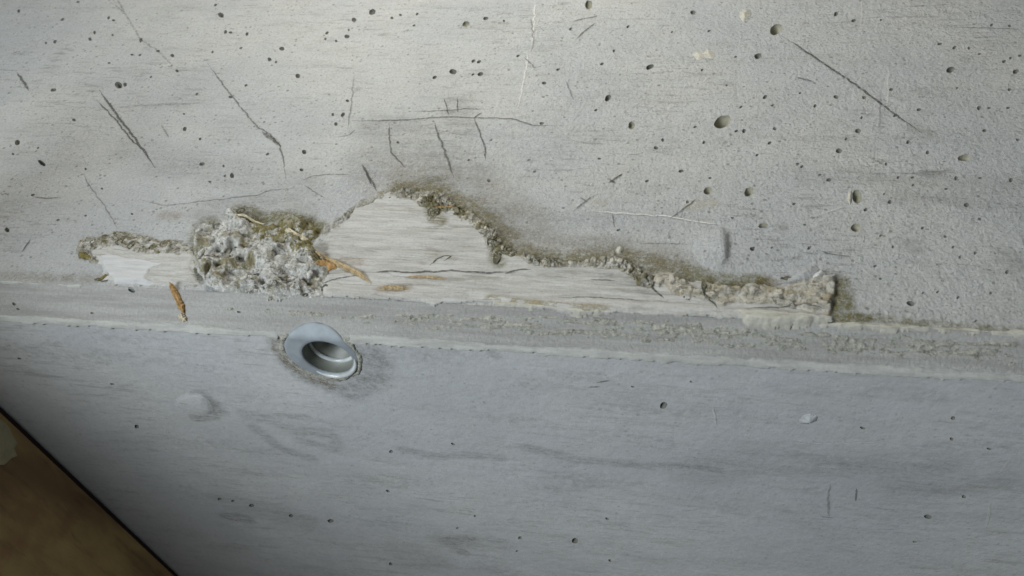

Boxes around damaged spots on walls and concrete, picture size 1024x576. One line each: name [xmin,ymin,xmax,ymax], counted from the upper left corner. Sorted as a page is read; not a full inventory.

spalling [73,231,201,287]
spalling [321,186,838,330]